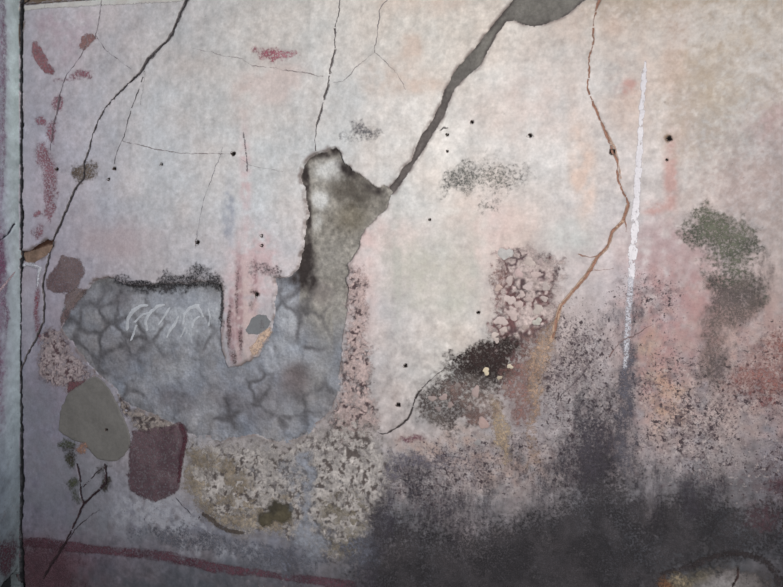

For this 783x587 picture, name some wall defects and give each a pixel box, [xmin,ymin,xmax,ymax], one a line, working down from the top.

crack [286,0,357,151]
crack [552,0,630,338]
crack [0,0,222,585]
leakage [115,263,224,341]
spalling [62,148,393,443]
leakage [340,61,783,587]
spalling [58,438,87,467]
spalling [184,450,293,534]
leakage [150,452,334,578]
crack [380,371,442,435]